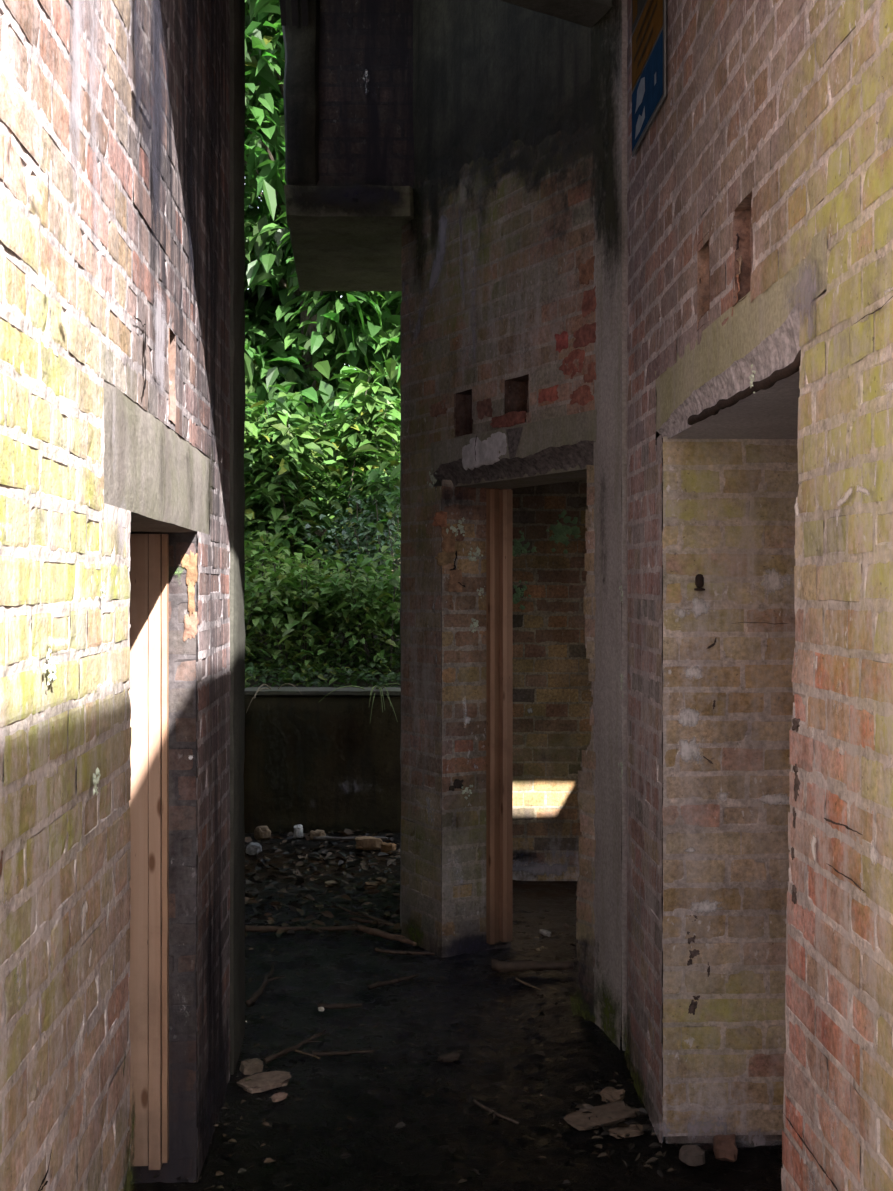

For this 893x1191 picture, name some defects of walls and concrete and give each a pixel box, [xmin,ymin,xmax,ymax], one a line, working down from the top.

leakage [590,0,622,262]
leakage [411,180,476,340]
spalling [538,256,597,406]
spalling [430,398,596,487]
crack [824,818,862,835]
crack [826,863,865,892]
crack [782,1111,838,1191]